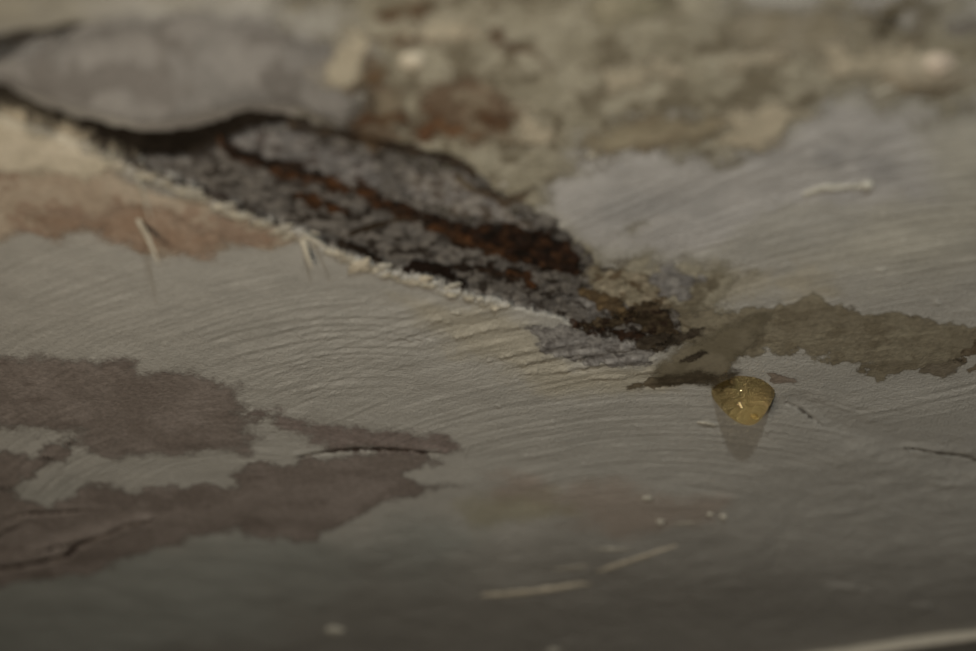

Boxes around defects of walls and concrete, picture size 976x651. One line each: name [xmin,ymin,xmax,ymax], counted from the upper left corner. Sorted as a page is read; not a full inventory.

crack [0,22,83,61]
leakage [0,108,297,260]
crack [0,84,537,227]
spalling [25,115,707,368]
corrosion [218,135,586,289]
corrosion [569,288,681,350]
leakage [278,0,976,230]
leakage [551,240,976,390]
crack [0,522,144,569]
leakage [0,356,458,588]